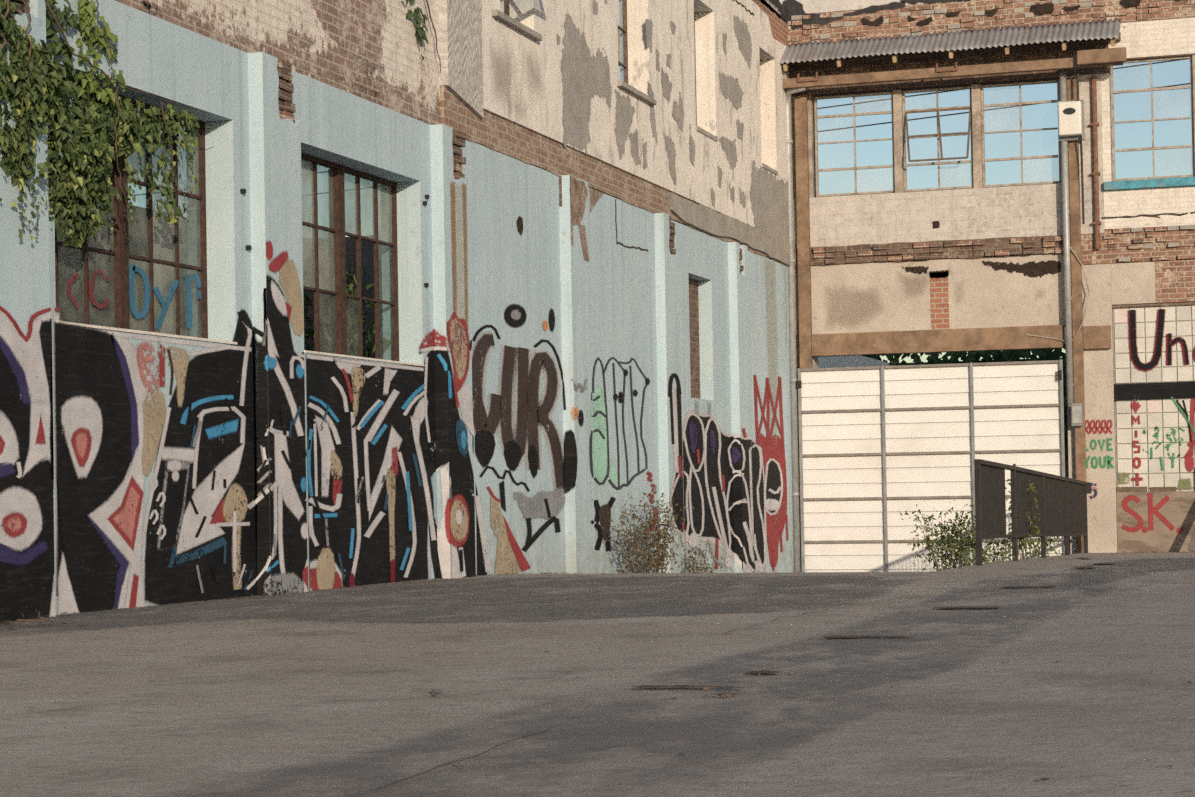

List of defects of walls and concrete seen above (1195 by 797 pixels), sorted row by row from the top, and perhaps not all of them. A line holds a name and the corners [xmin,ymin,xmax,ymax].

spalling [10,0,30,14]
flaking render [723,15,752,69]
spalling [752,0,1161,46]
peeling [118,0,467,179]
flaking render [557,14,695,184]
flaking render [711,73,790,243]
peeling [559,176,603,262]
spalling [813,221,1071,330]
crack [1102,211,1195,219]
spalling [1103,225,1195,262]